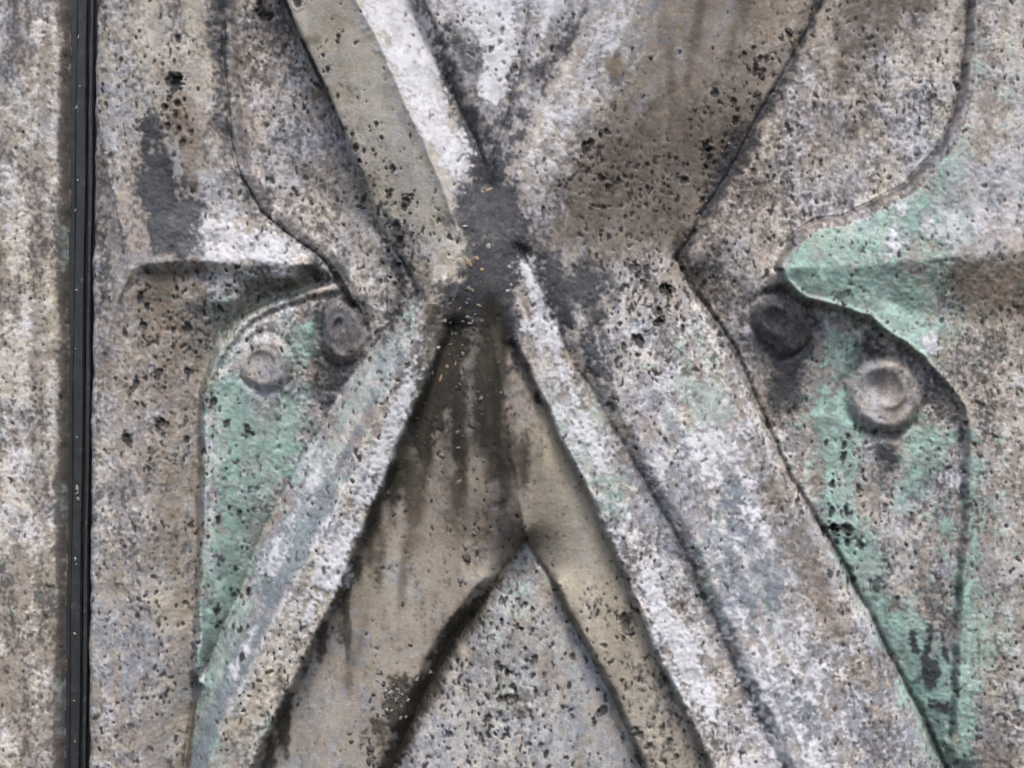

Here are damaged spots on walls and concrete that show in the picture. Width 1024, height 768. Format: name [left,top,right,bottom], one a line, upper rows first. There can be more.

water stain [677,0,825,261]
water stain [302,0,618,672]
water stain [701,295,740,355]
water stain [371,577,504,768]